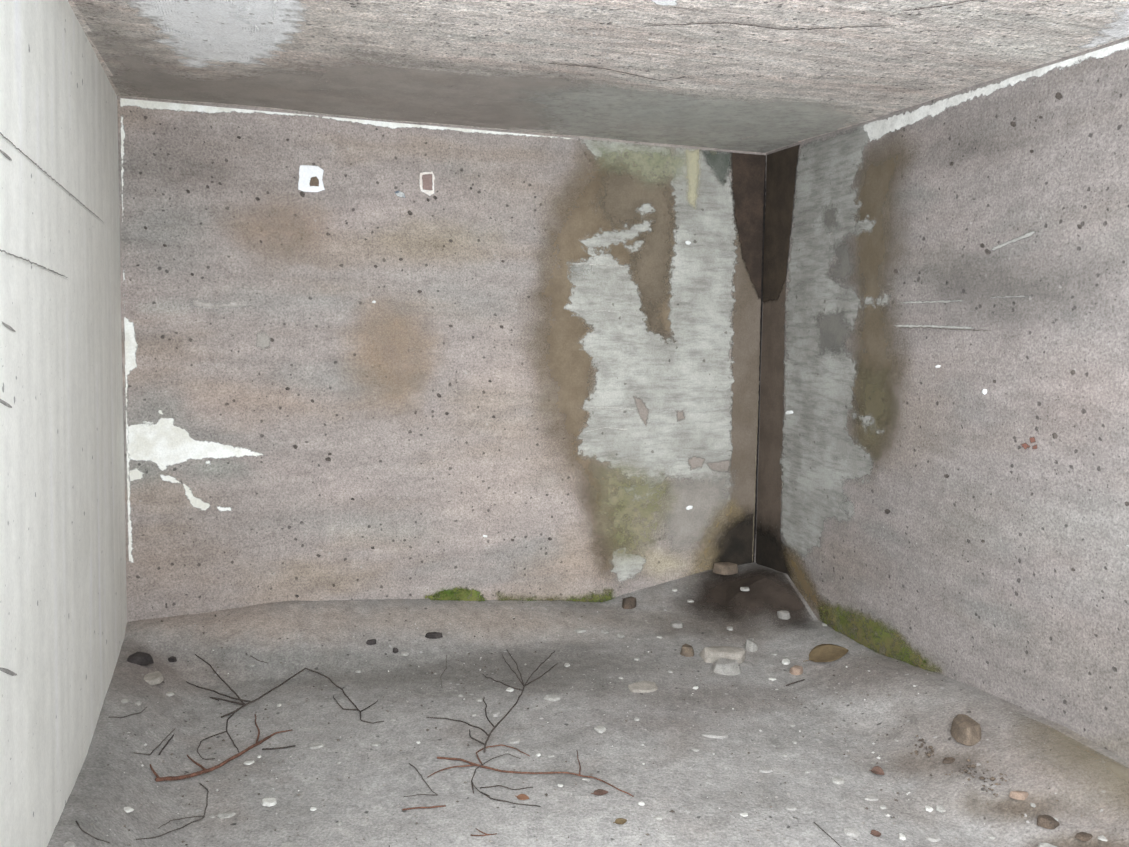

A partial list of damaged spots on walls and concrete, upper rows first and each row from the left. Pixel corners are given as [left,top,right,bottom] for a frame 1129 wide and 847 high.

water stain [132,0,305,68]
crack [0,249,68,280]
peeling [124,305,263,563]
peeling [120,98,737,508]
peeling [611,547,646,581]
water stain [533,88,852,626]
water stain [850,145,906,462]
peeling [780,40,1129,557]